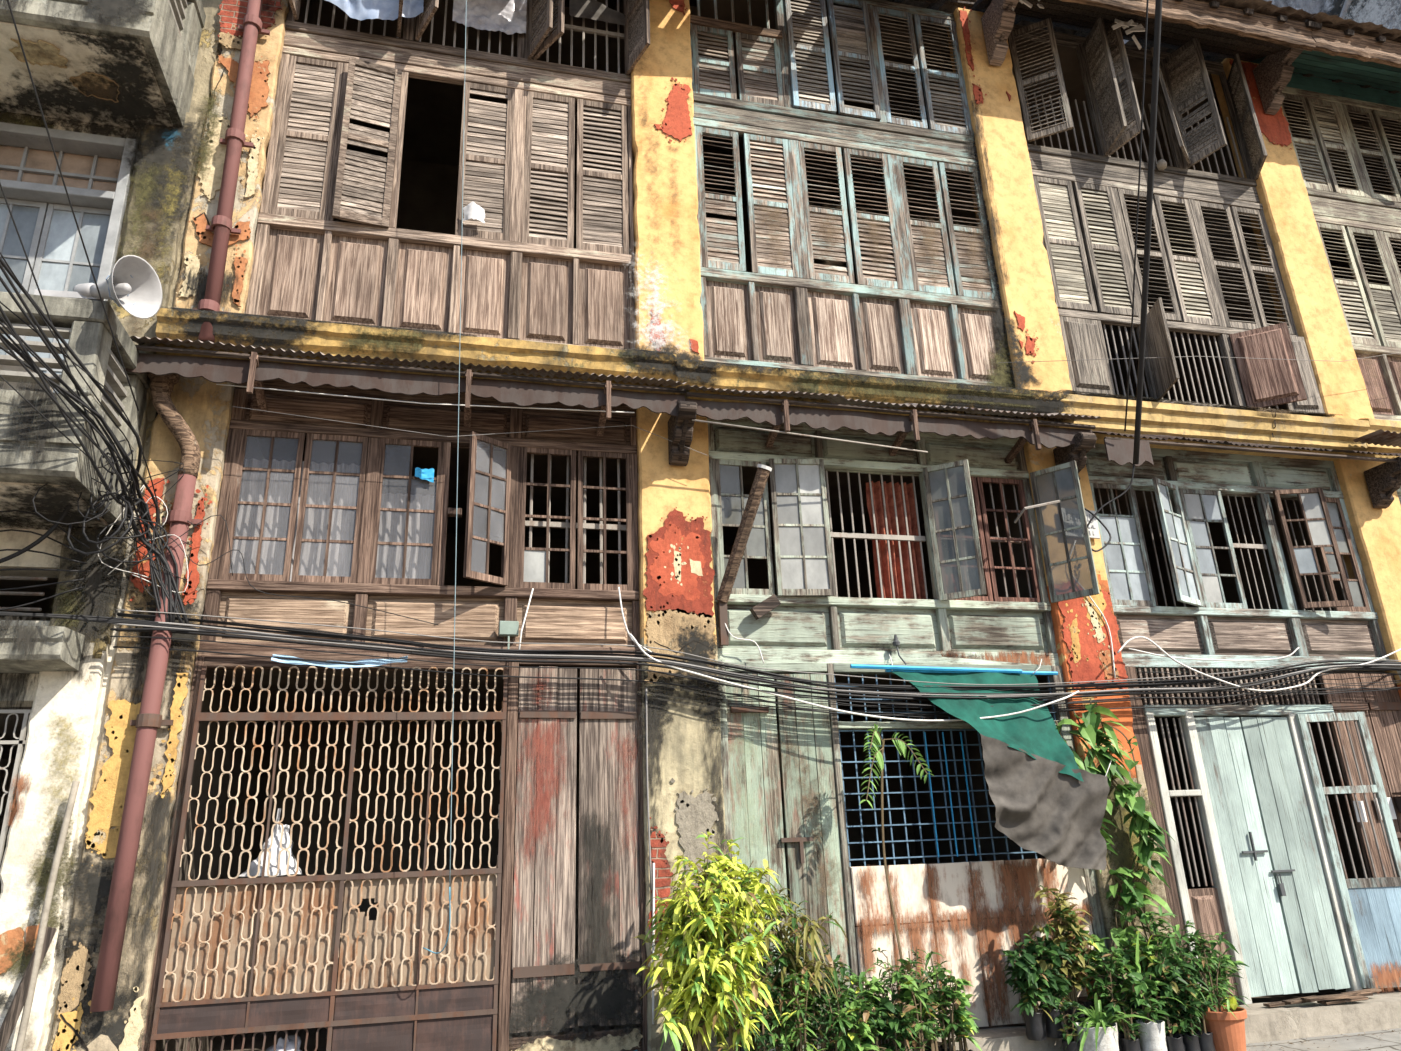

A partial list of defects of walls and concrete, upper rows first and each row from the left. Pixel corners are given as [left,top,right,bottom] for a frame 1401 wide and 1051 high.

leakage [0,0,203,275]
flaking render [176,0,283,309]
peeling [654,77,692,142]
leakage [342,327,424,354]
leakage [635,353,717,386]
peeling [643,507,720,690]
peeling [1057,569,1128,689]
peeling [85,699,141,866]
leakage [497,666,728,1050]
flaking render [52,941,97,1051]
flaking render [119,986,145,1051]
rust [858,860,1093,1023]